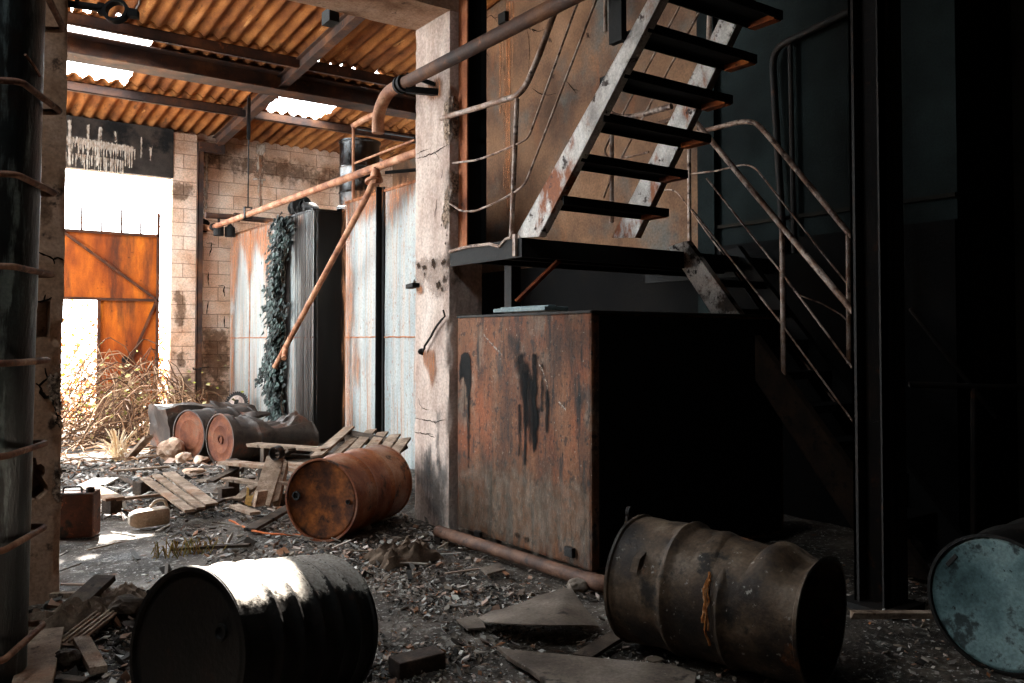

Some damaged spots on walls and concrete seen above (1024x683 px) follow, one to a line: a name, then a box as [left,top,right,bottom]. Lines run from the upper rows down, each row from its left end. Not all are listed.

leakage [66,120,152,180]
corrosion [230,224,271,393]
corrosion [344,177,413,427]
leakage [518,354,543,464]